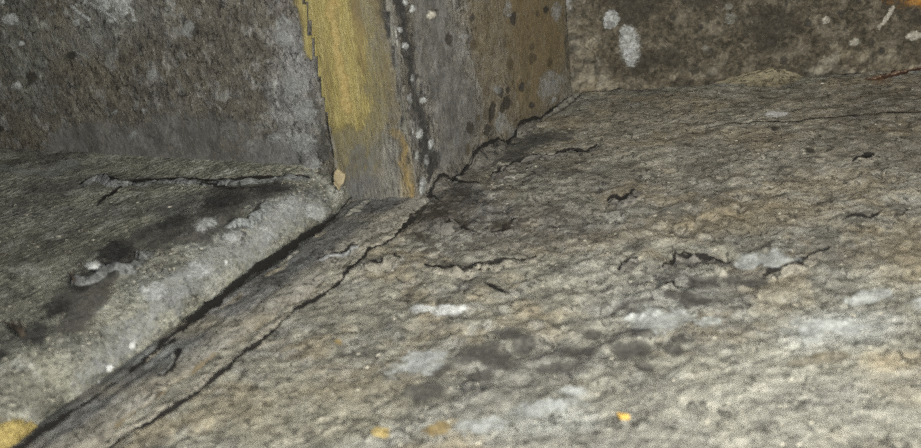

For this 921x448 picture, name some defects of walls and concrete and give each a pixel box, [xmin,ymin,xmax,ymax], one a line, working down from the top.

water stain [536,0,921,84]
water stain [377,0,440,183]
water stain [466,82,525,154]
water stain [482,127,574,169]
water stain [405,184,472,242]
crack [607,189,643,207]
crack [13,88,621,448]